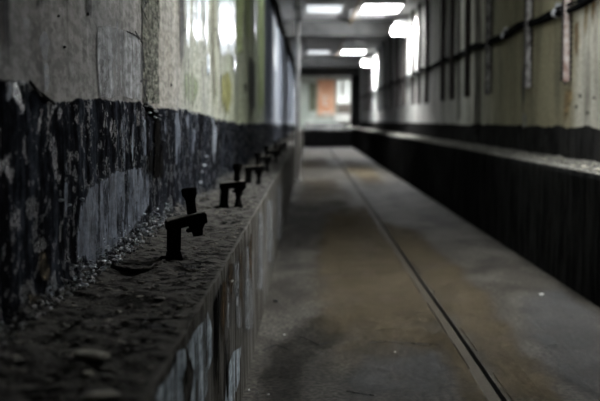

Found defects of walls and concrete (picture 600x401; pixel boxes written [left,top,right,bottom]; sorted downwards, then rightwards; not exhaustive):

water stain [121,116,134,171]
water stain [175,112,195,166]
water stain [71,203,170,288]